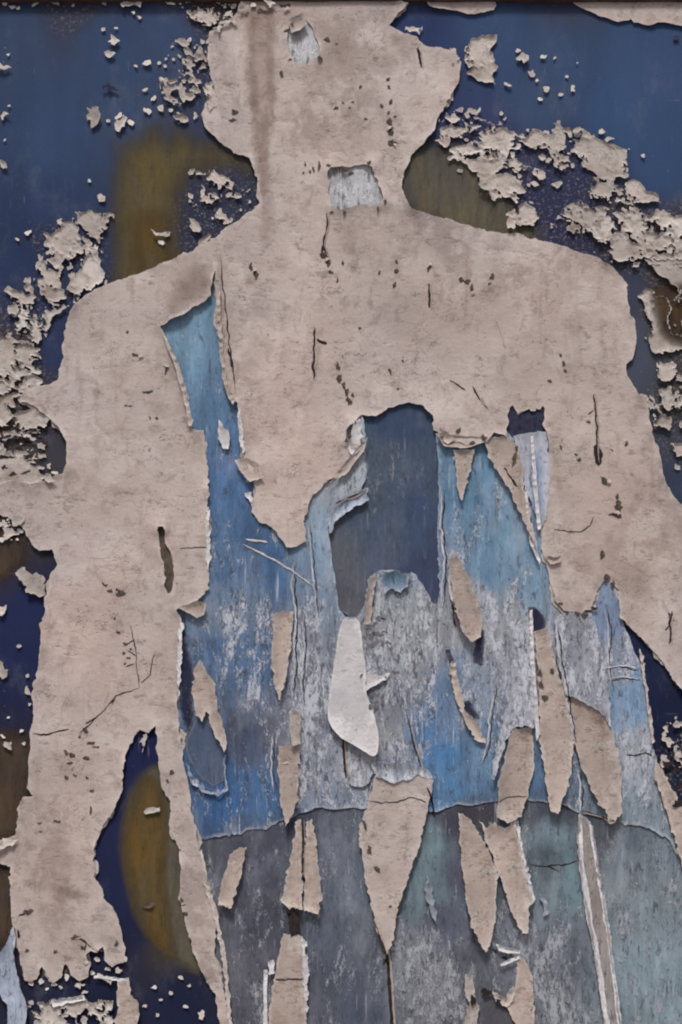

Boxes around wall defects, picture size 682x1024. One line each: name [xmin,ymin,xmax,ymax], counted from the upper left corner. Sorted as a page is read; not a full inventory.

leakage [113,133,252,280]
peeling [188,169,250,206]
leakage [402,145,535,239]
peeling [435,107,682,305]
peeling [638,289,682,354]
peeling [31,970,140,1024]
crack [33,626,155,736]
leakage [122,766,203,974]
peeling [263,710,323,1024]
peeling [328,618,434,955]
peeling [576,813,621,1024]
peeling [639,648,682,864]